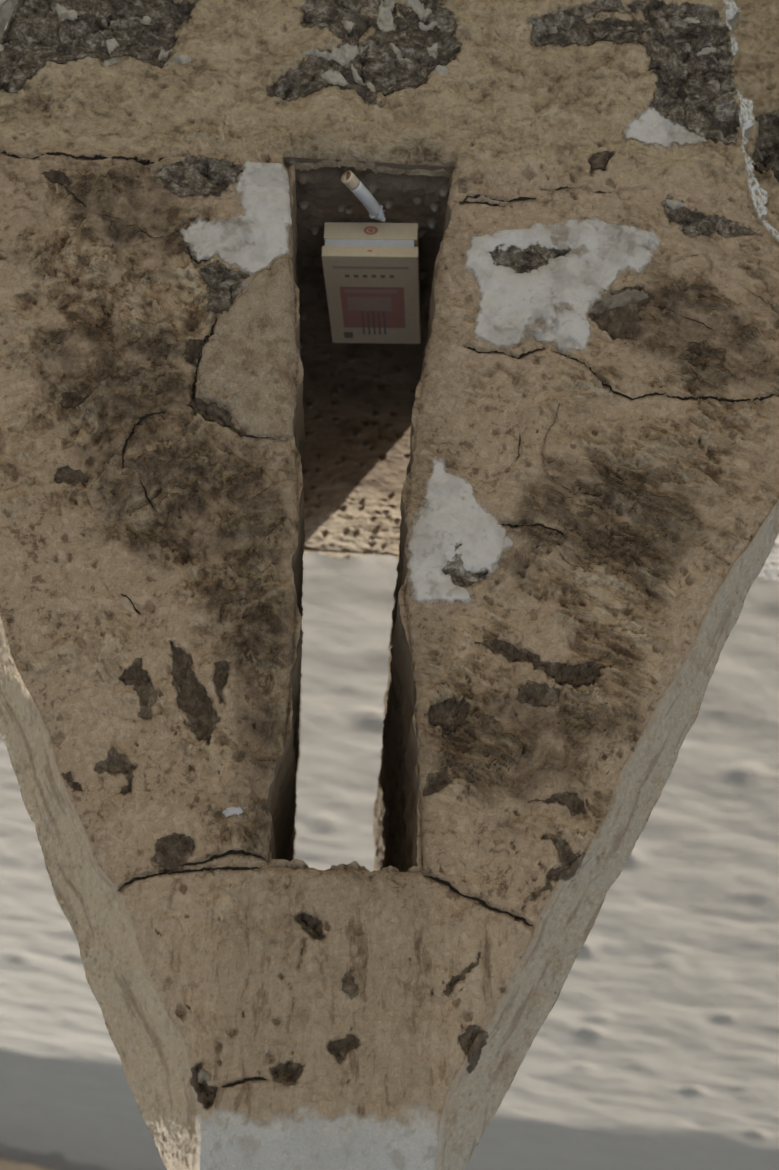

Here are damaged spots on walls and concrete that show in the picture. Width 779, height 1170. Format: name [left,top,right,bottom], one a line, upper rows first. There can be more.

spalling [0,0,198,94]
spalling [266,0,462,107]
spalling [527,0,741,149]
crack [1,151,163,165]
spalling [752,109,779,183]
crack [192,317,217,399]
crack [464,347,779,402]
spalling [119,658,158,719]
spalling [170,641,231,744]
spalling [151,832,194,873]
crack [118,850,265,891]
crack [425,875,533,927]